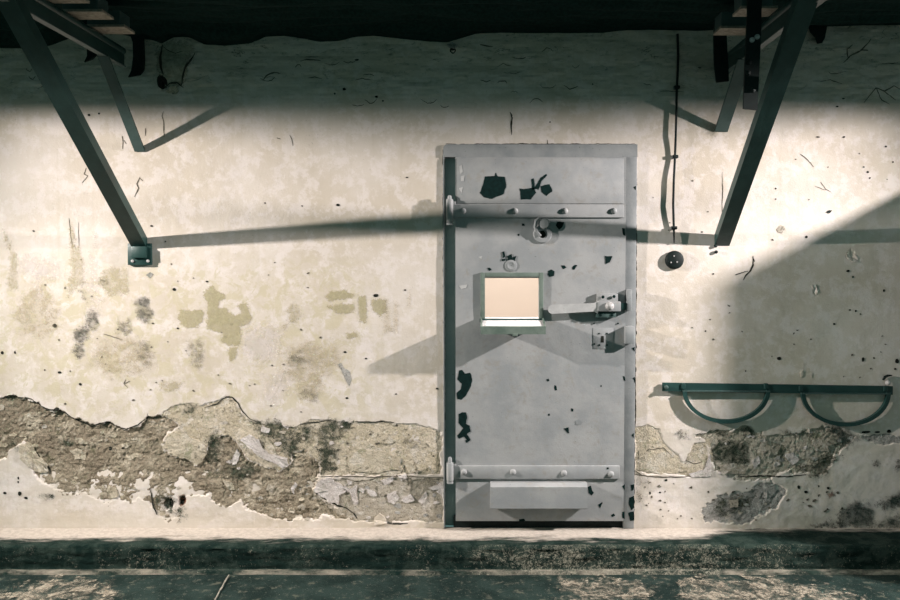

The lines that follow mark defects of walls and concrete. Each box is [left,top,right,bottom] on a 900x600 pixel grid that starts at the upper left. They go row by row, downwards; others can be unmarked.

damp [72,312,99,359]
damp [97,297,153,371]
flaking render [0,395,444,525]
flaking render [611,425,900,525]